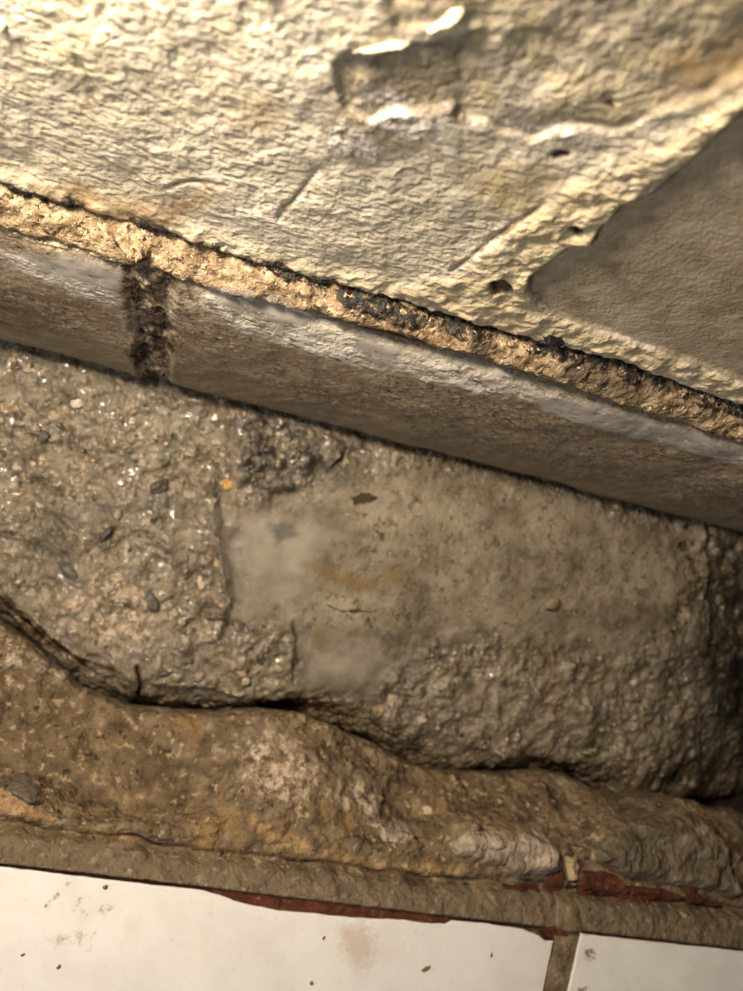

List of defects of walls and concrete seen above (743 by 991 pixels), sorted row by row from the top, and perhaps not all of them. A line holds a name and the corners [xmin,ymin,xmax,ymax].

peeling [530,111,743,379]
spalling [0,645,75,681]
crack [134,669,142,702]
crack [179,698,304,711]
crack [290,624,298,673]
spalling [206,729,386,833]